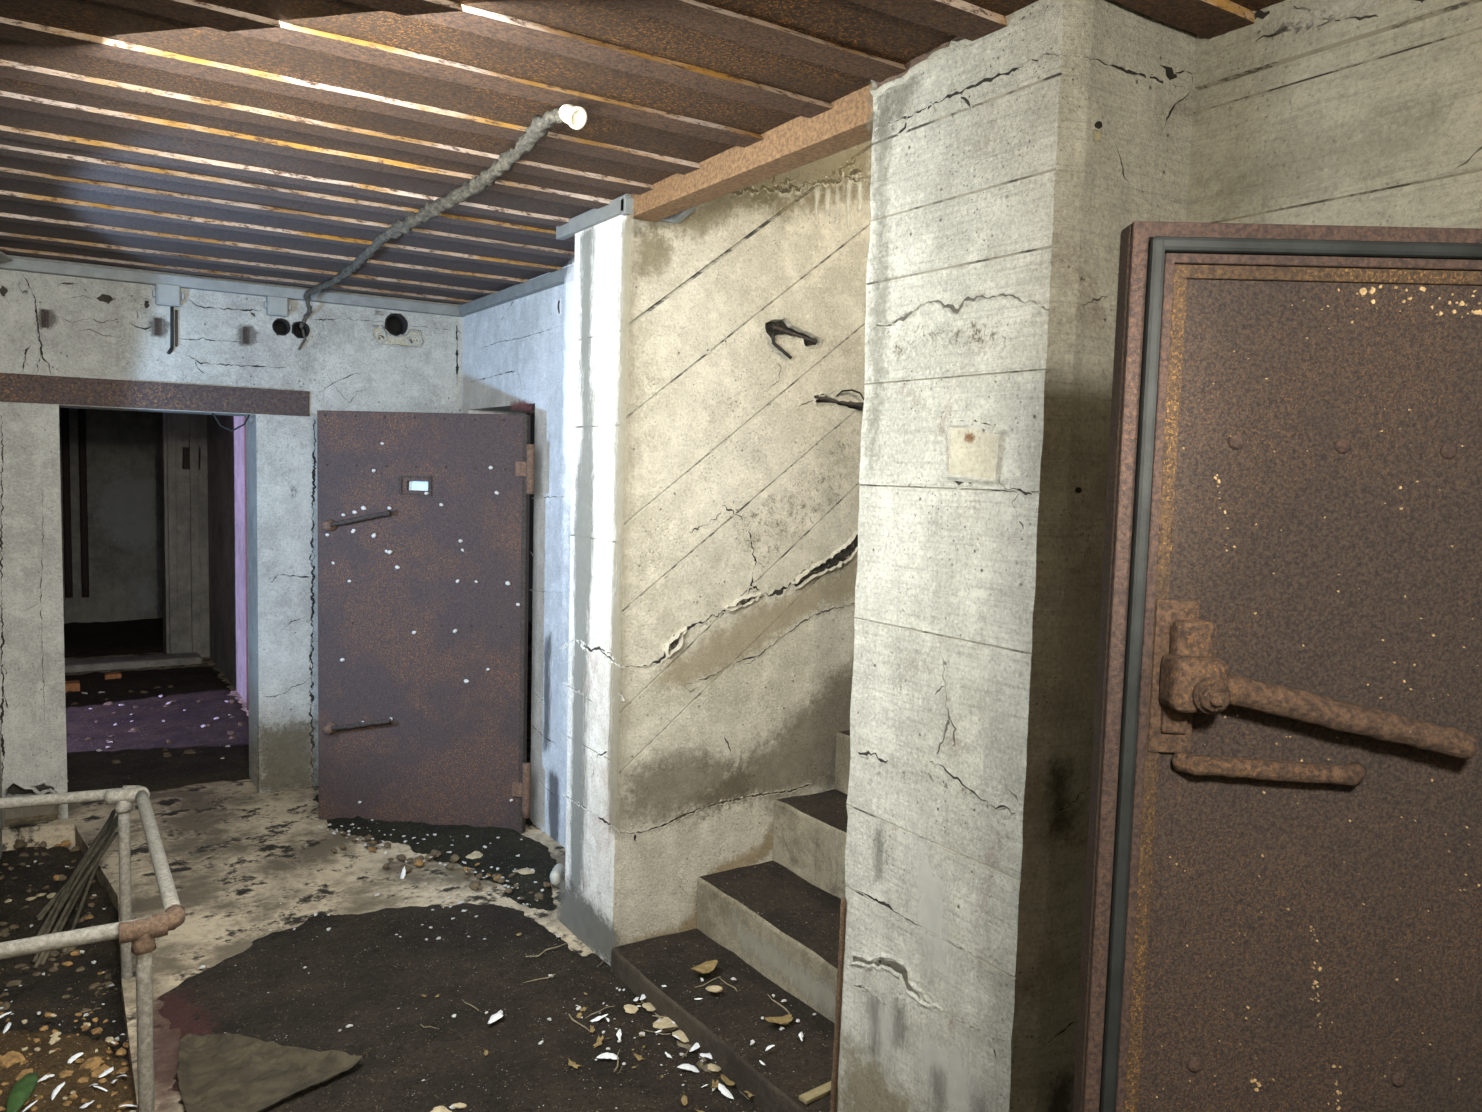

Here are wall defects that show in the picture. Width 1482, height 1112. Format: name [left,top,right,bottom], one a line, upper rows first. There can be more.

crack [874,0,1436,136]
leakage [549,228,617,966]
crack [529,504,889,842]
leakage [608,142,871,831]
crack [930,645,1019,816]